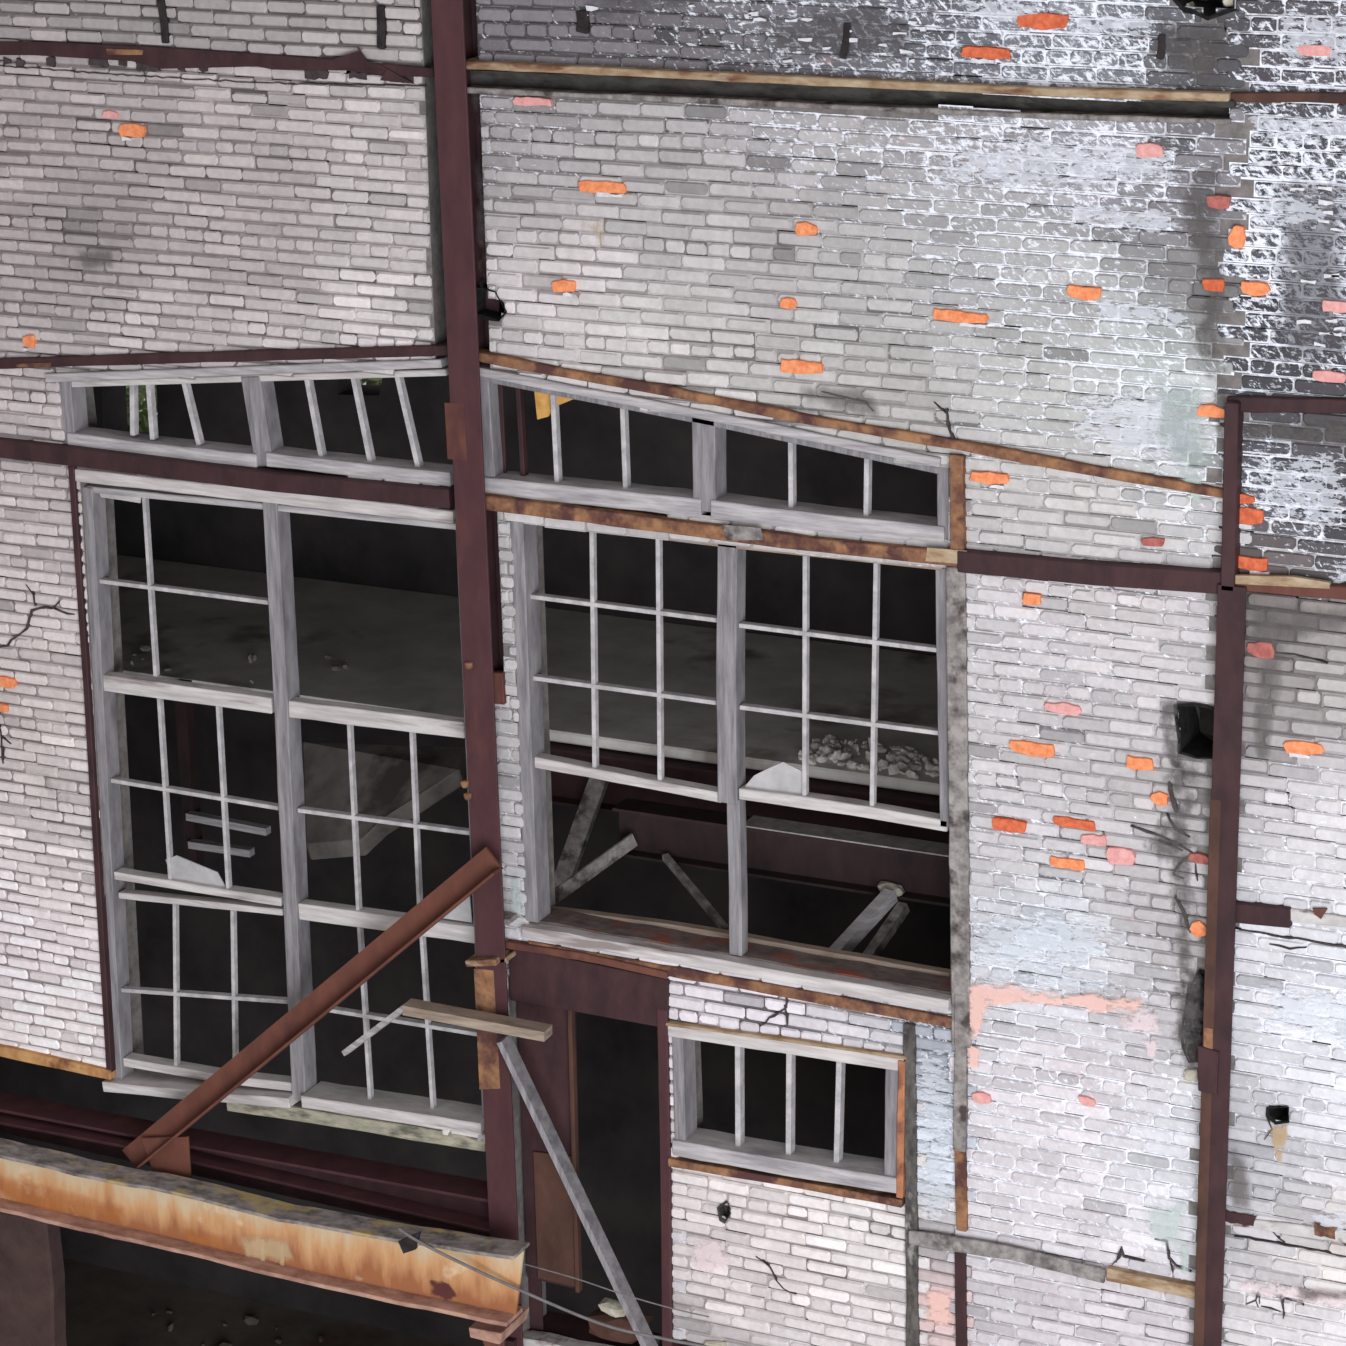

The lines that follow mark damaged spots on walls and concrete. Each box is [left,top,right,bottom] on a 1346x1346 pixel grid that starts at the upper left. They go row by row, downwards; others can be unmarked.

peeling [586,0,696,16]
spalling [1173,0,1235,21]
peeling [744,8,926,66]
flaking render [1239,493,1264,529]
flaking render [1238,555,1270,575]
crack [0,584,75,648]
crack [0,724,12,764]
crack [1130,825,1198,881]
rust [1312,908,1328,919]
crack [1234,1232,1346,1257]
rust [430,1281,456,1299]
crack [1246,1292,1305,1319]